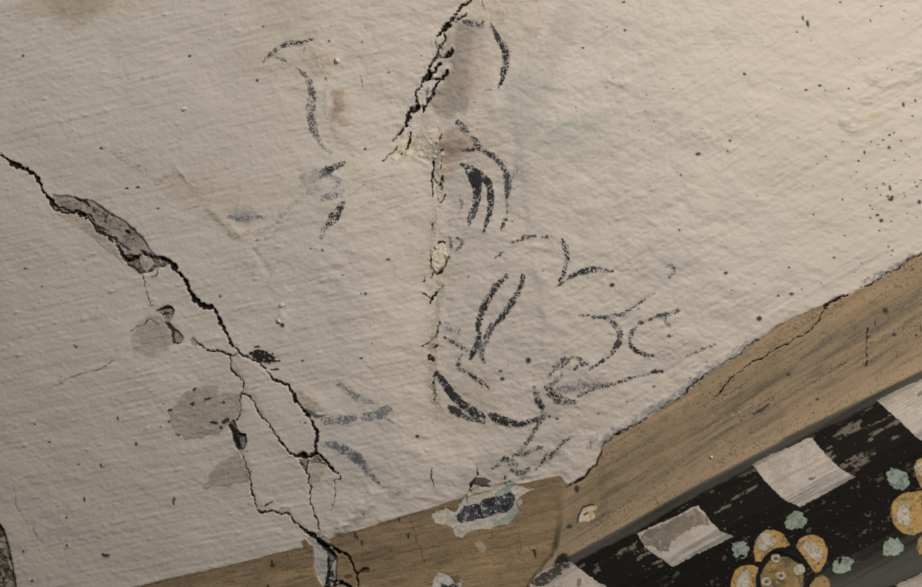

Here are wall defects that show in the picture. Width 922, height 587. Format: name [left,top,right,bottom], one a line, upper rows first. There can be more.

crack [382,0,484,161]
crack [430,134,446,203]
flaking render [53,194,170,273]
crack [422,224,450,402]
crack [0,154,359,587]
flaking render [0,525,17,587]
flaking render [301,531,340,587]
peeling [432,572,463,587]
peeling [432,477,534,556]